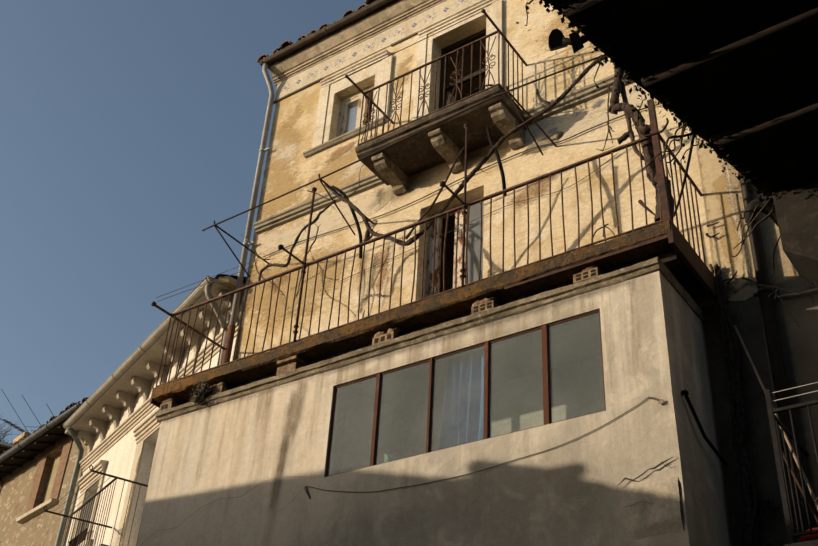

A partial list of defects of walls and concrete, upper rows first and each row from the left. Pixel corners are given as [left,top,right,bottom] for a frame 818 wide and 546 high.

flaking render [542,11,600,83]
flaking render [696,135,758,302]
crack [616,457,673,507]